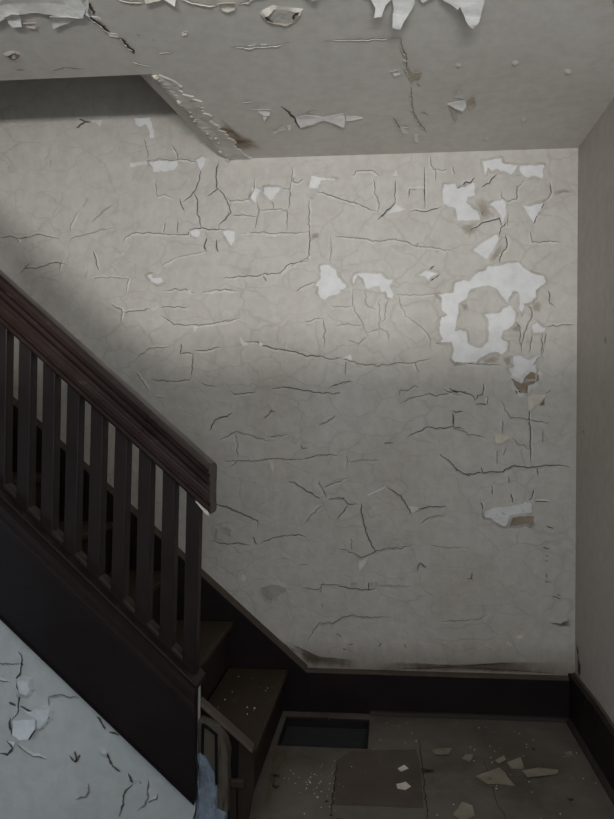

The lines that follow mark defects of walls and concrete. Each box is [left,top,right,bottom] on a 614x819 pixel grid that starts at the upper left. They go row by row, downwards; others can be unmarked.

peeling [0,0,100,29]
peeling [371,0,427,30]
peeling [443,0,484,29]
flaking render [151,74,252,162]
crack [336,37,427,133]
peeling [313,262,396,303]
peeling [434,156,549,411]
crack [0,146,575,509]
crack [288,481,426,568]
crack [301,583,391,650]
crack [0,652,78,759]
crack [107,754,158,817]